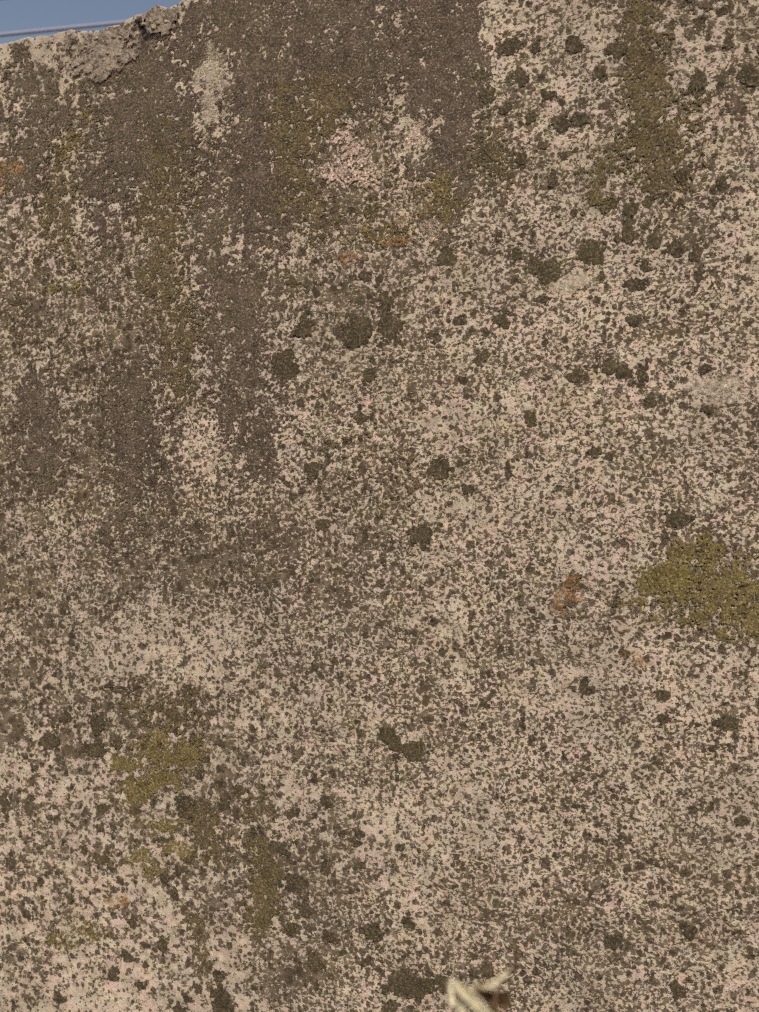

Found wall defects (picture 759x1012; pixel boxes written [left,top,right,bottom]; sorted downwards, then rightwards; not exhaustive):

leakage [0,0,516,665]